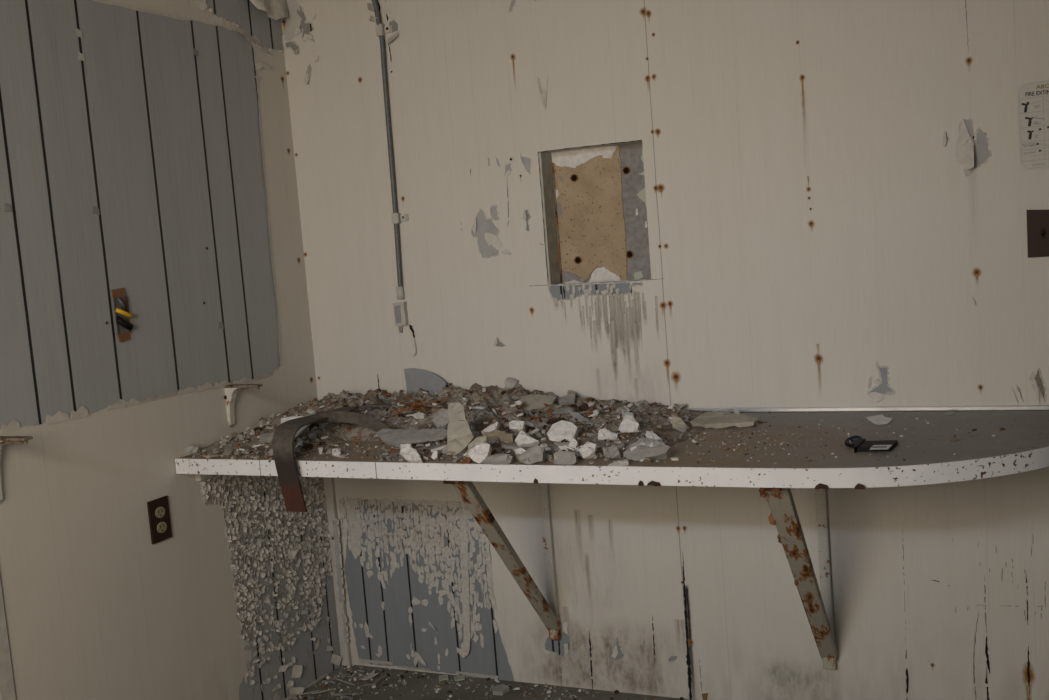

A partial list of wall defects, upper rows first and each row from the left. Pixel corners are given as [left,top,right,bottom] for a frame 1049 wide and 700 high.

peeling [281,0,316,55]
peeling [471,204,512,259]
damp [554,289,658,359]
peeling [200,475,514,700]